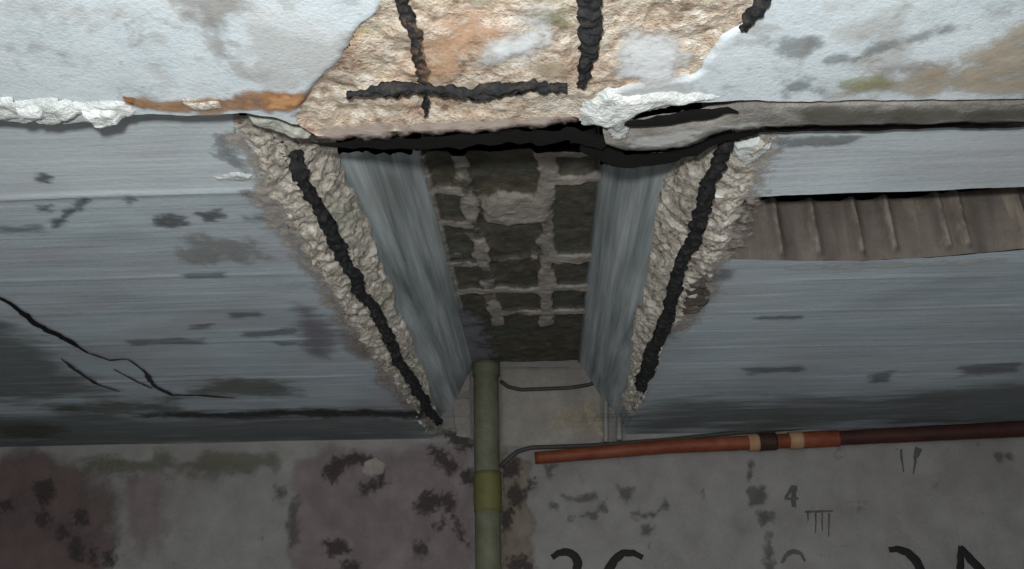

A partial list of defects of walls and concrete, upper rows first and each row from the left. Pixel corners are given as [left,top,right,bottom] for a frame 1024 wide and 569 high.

corrosion [122,91,308,114]
damp [52,199,89,227]
damp [154,212,226,228]
spalling [213,0,772,569]
spalling [603,99,1024,416]
crack [0,297,235,399]
damp [142,409,425,419]
damp [0,451,117,569]